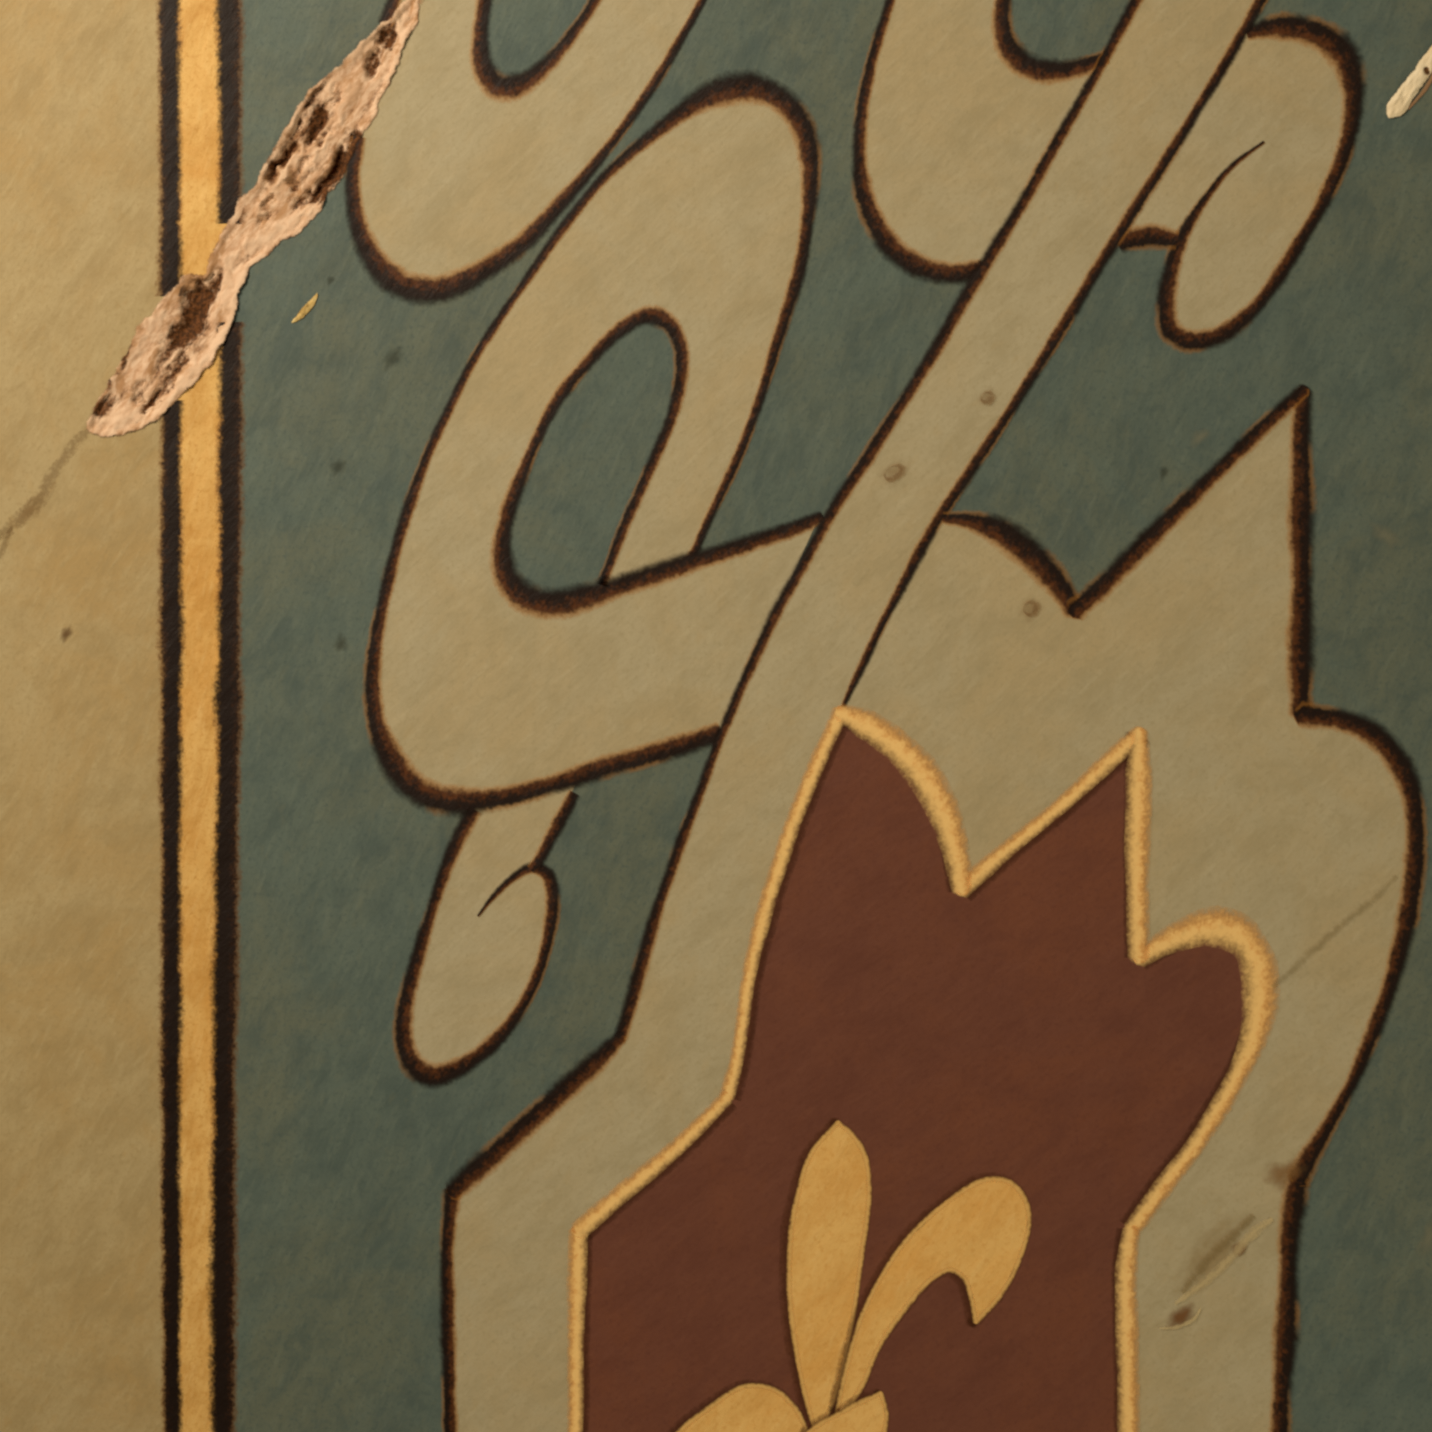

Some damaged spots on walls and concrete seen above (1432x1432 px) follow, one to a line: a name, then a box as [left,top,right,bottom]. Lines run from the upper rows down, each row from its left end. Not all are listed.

peeling [1386,46,1432,118]
peeling [292,293,318,323]